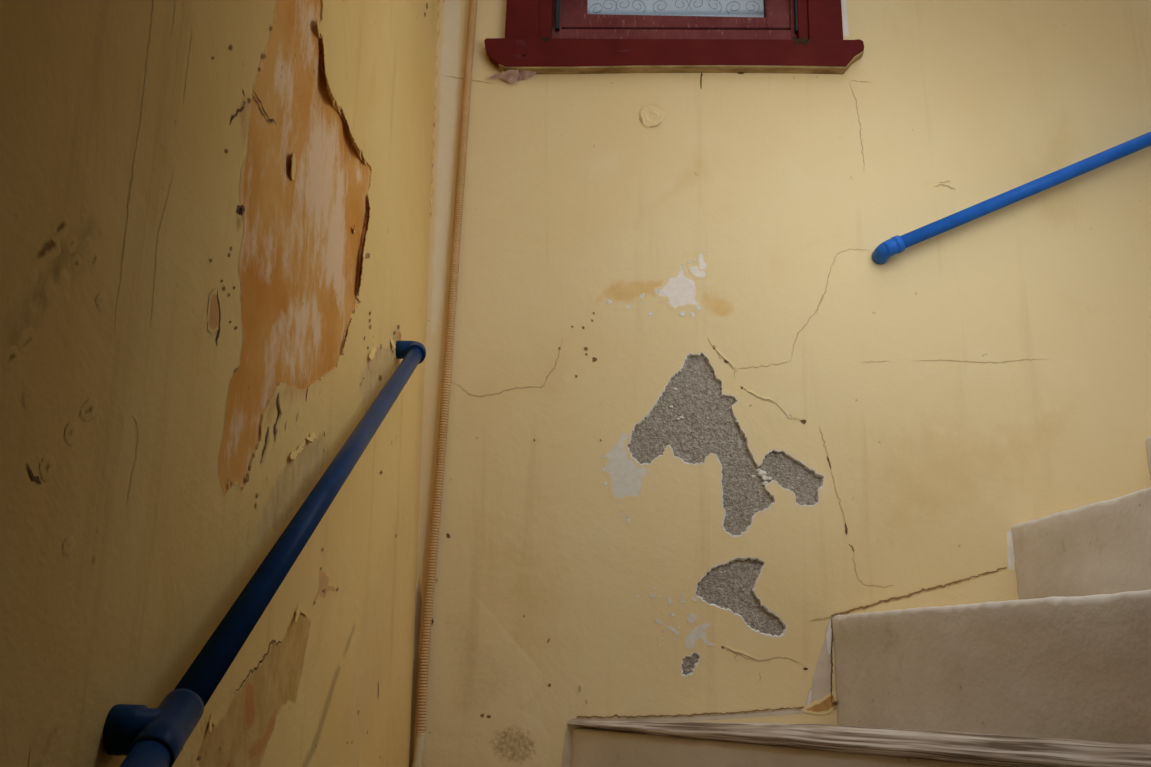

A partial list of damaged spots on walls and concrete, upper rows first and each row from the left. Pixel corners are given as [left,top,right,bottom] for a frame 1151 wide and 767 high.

crack [850,80,868,166]
peeling [218,0,402,563]
peeling [626,249,709,317]
crack [454,343,562,397]
flaking render [601,352,825,537]
crack [708,249,894,588]
crack [913,357,1041,365]
peeling [192,567,339,767]
flaking render [637,556,787,677]